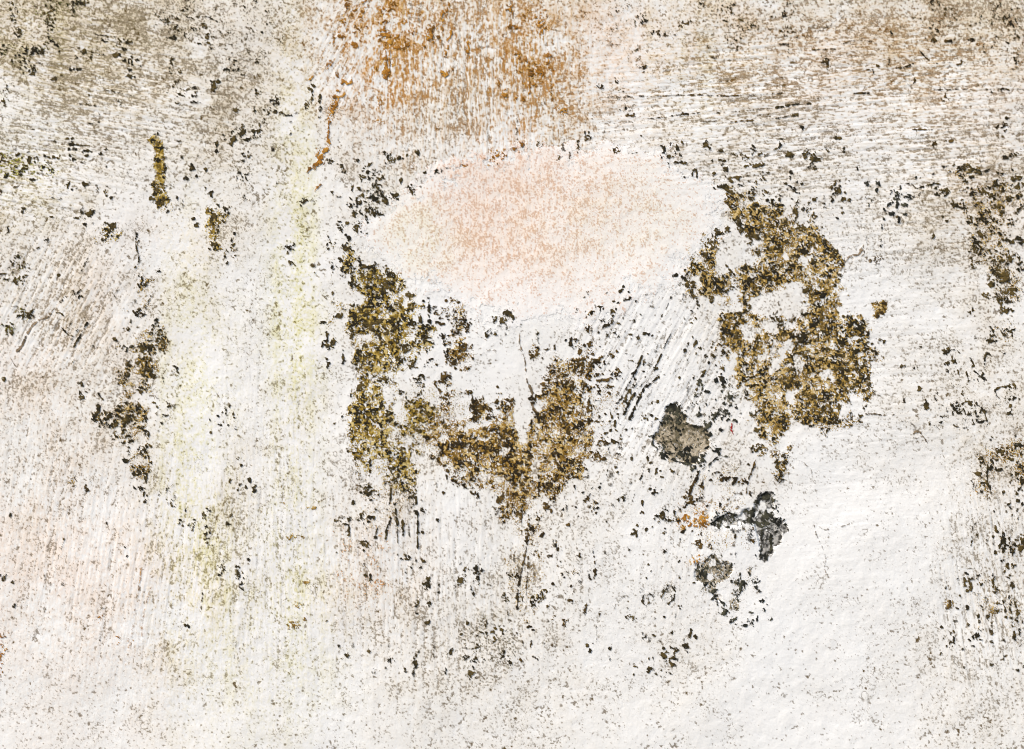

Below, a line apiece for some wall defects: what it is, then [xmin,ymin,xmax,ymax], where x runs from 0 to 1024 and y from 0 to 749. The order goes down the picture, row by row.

mould [139,132,183,214]
damp [155,0,322,201]
corrosion [307,55,353,190]
corrosion [325,0,454,126]
corrosion [487,0,567,115]
damp [647,93,812,130]
damp [552,0,1024,100]
mould [40,181,213,546]
damp [320,136,888,683]
spalling [648,401,728,472]
damp [864,129,1024,520]
spalling [694,491,789,627]